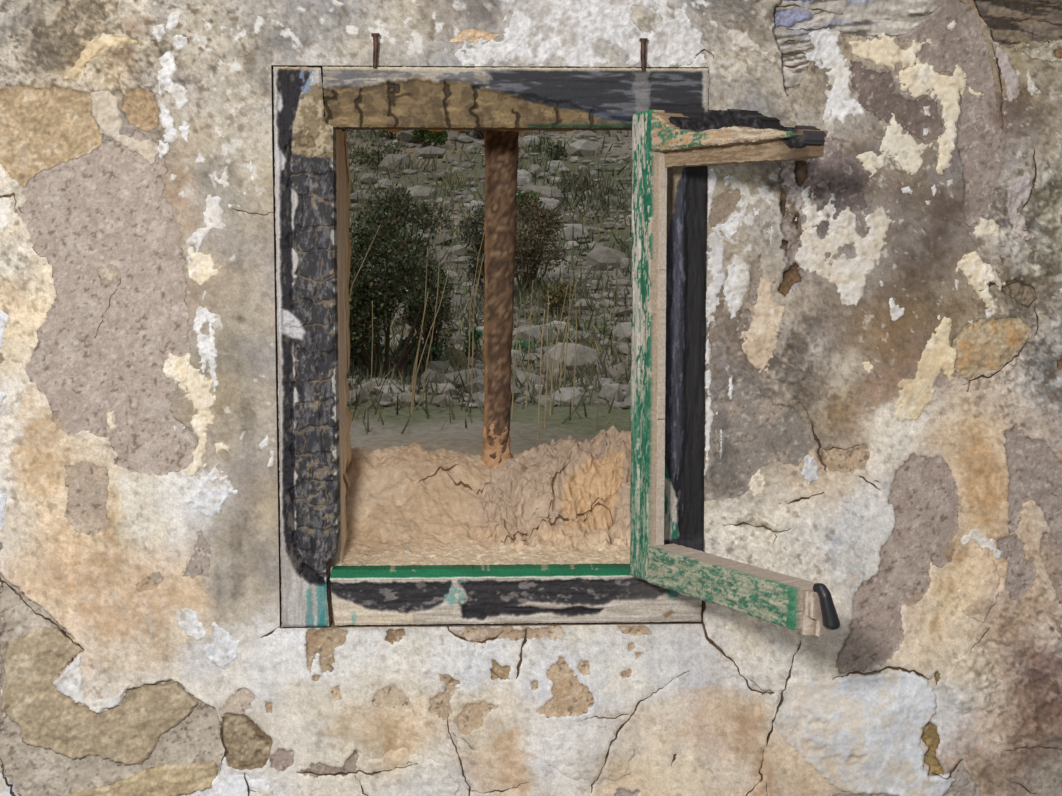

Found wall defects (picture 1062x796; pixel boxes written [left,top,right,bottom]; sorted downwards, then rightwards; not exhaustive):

peeling [0,10,247,536]
peeling [450,0,1062,501]
peeling [835,424,1062,675]
crack [0,577,84,650]
spalling [0,572,359,796]
crack [297,761,418,796]
crack [447,626,527,679]
crack [447,714,529,796]
peeling [531,656,594,718]
crack [584,671,689,793]
crack [702,601,801,796]
peeling [921,722,980,796]